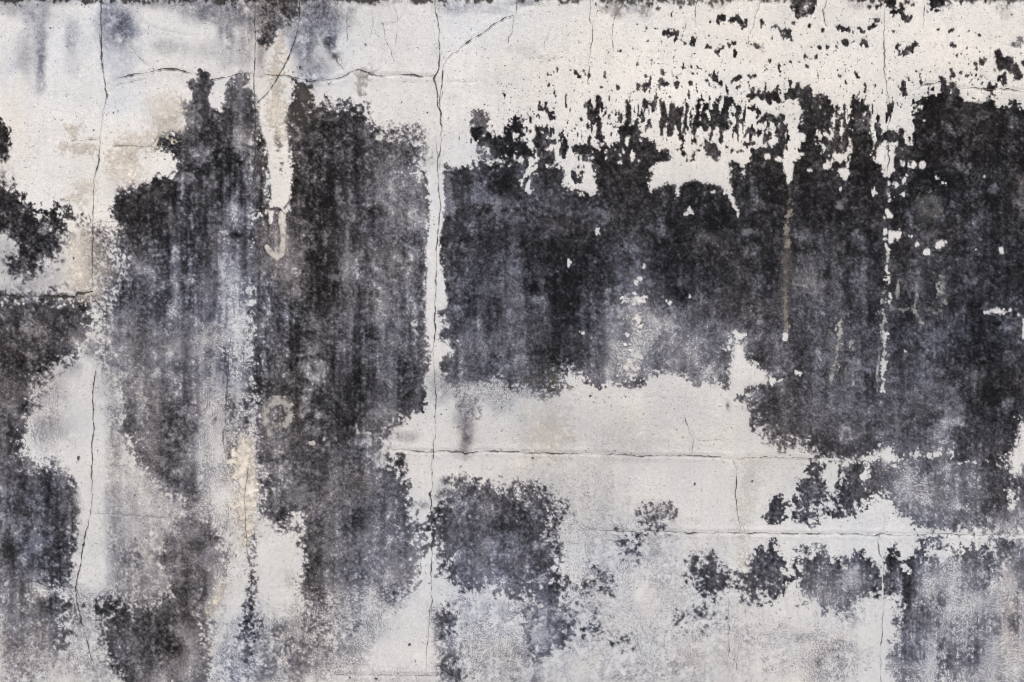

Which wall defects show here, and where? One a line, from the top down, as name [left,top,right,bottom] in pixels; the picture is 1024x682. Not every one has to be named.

water stain [0,117,12,163]
crack [883,10,891,170]
crack [919,81,1021,92]
water stain [40,284,67,296]
crack [0,0,577,677]
water stain [437,134,1024,682]
crack [589,419,1007,645]